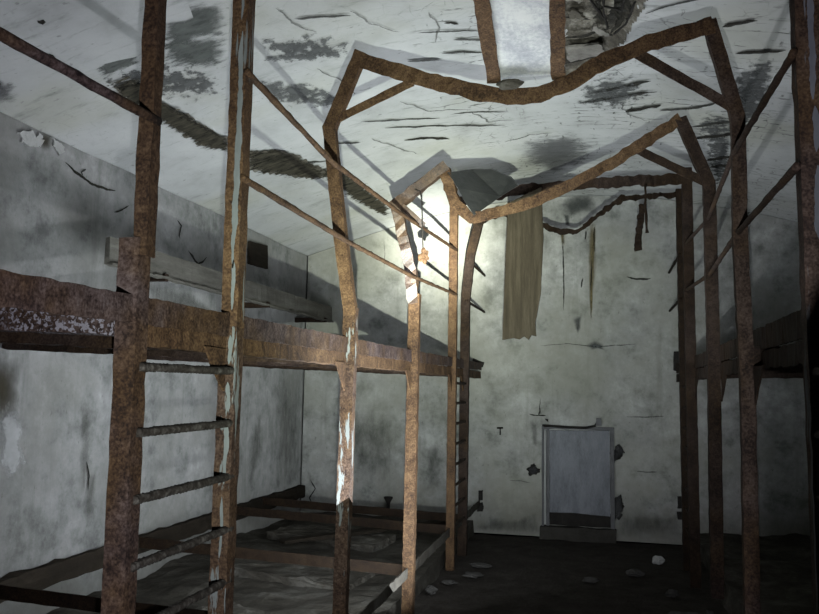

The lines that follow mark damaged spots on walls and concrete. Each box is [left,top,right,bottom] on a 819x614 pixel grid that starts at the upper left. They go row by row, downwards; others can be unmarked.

crack [646,0,696,14]
crack [277,9,396,32]
crack [723,19,757,27]
crack [408,14,482,62]
spalling [565,0,648,75]
damp [162,6,223,100]
damp [99,57,141,86]
crack [65,162,128,213]
spalling [614,444,625,463]
spalling [526,463,541,476]
spalling [615,495,625,520]